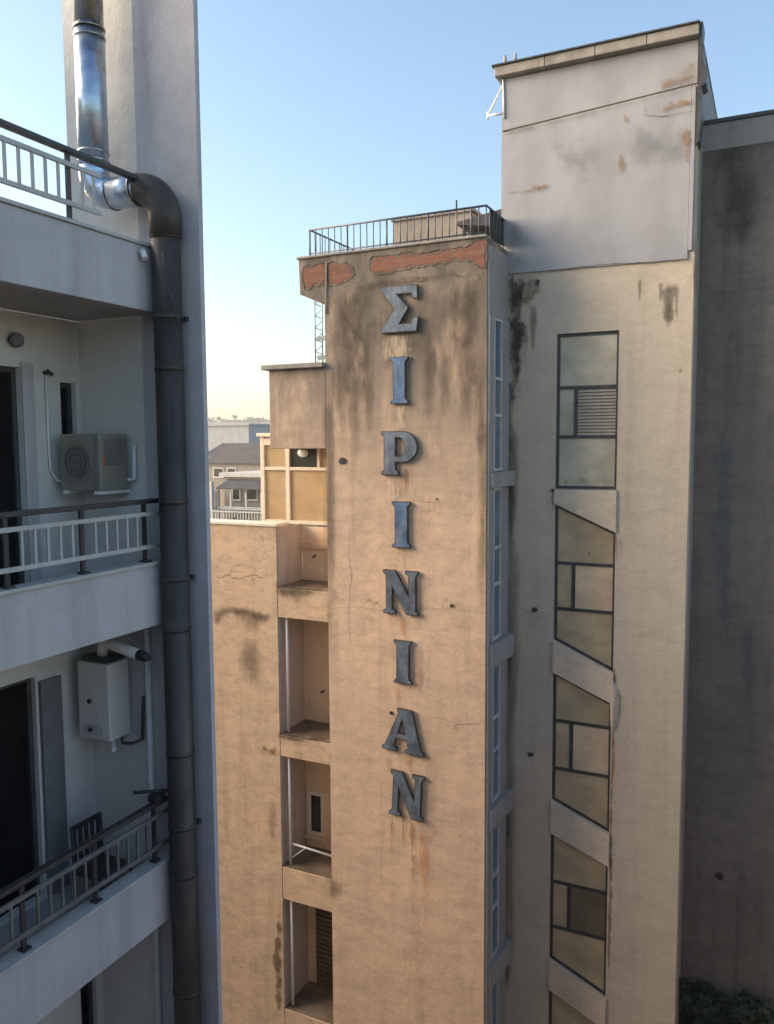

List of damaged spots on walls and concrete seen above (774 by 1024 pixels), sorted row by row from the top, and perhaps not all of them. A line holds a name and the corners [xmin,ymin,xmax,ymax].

flaking render [301,261,355,290]
flaking render [369,237,488,281]
water stain [389,336,406,357]
water stain [508,276,539,399]